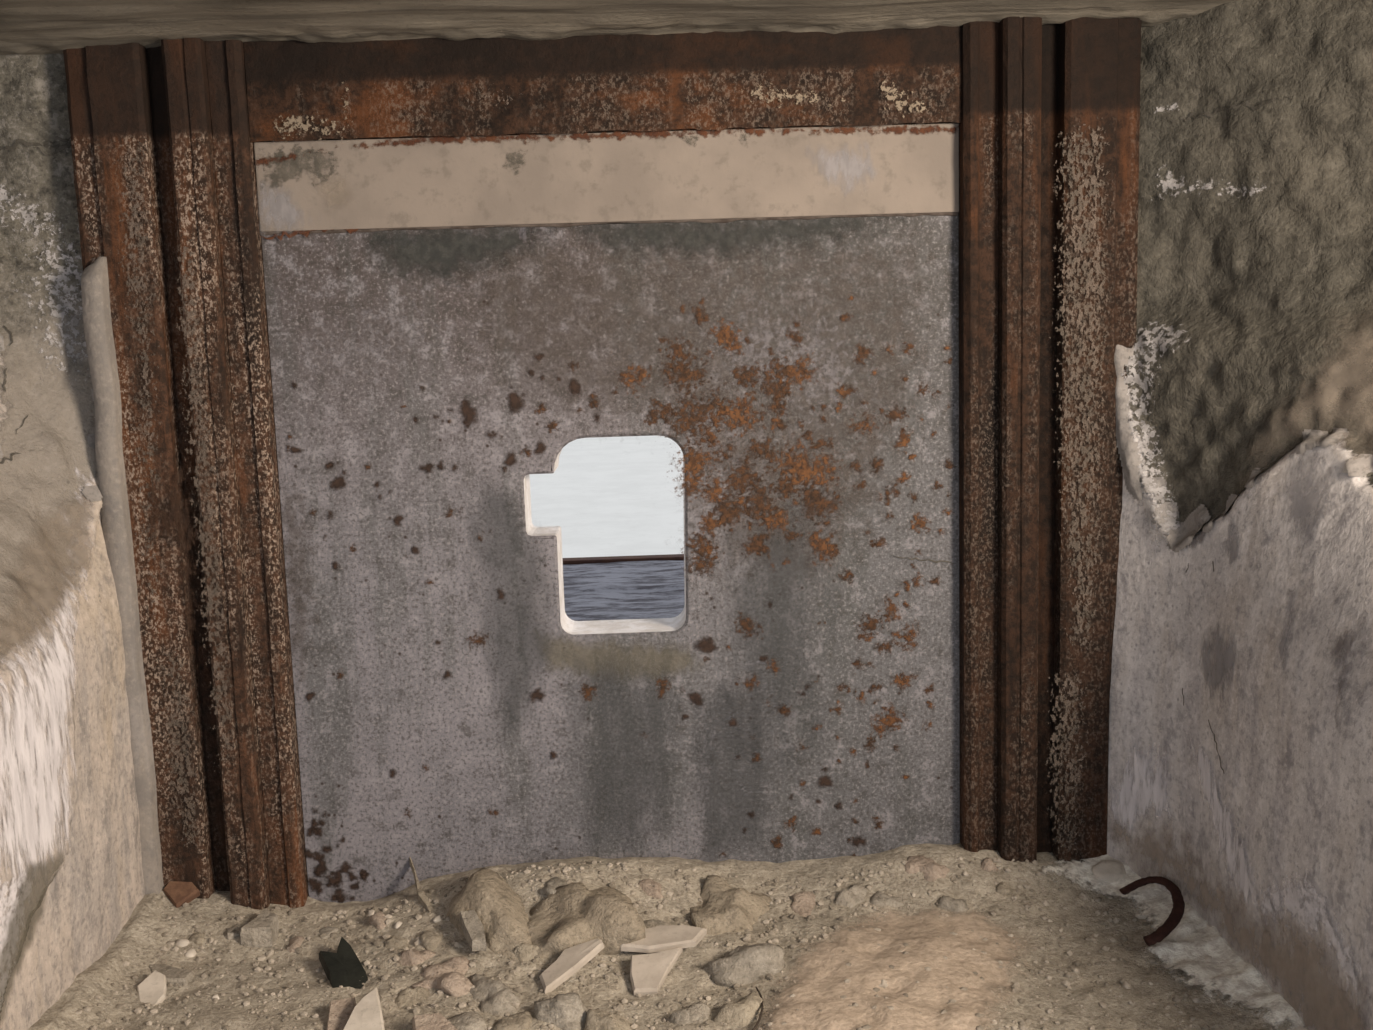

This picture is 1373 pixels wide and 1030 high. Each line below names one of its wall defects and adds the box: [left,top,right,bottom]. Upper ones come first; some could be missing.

rust [354,125,956,149]
rust [256,147,337,165]
spalling [1049,0,1373,653]
spalling [0,54,103,663]
rust [401,399,476,427]
rust [503,387,559,472]
rust [325,462,346,489]
rust [420,461,457,472]
rust [529,297,956,856]
rust [466,632,489,649]
peeling [1046,671,1088,859]
rust [163,881,200,908]